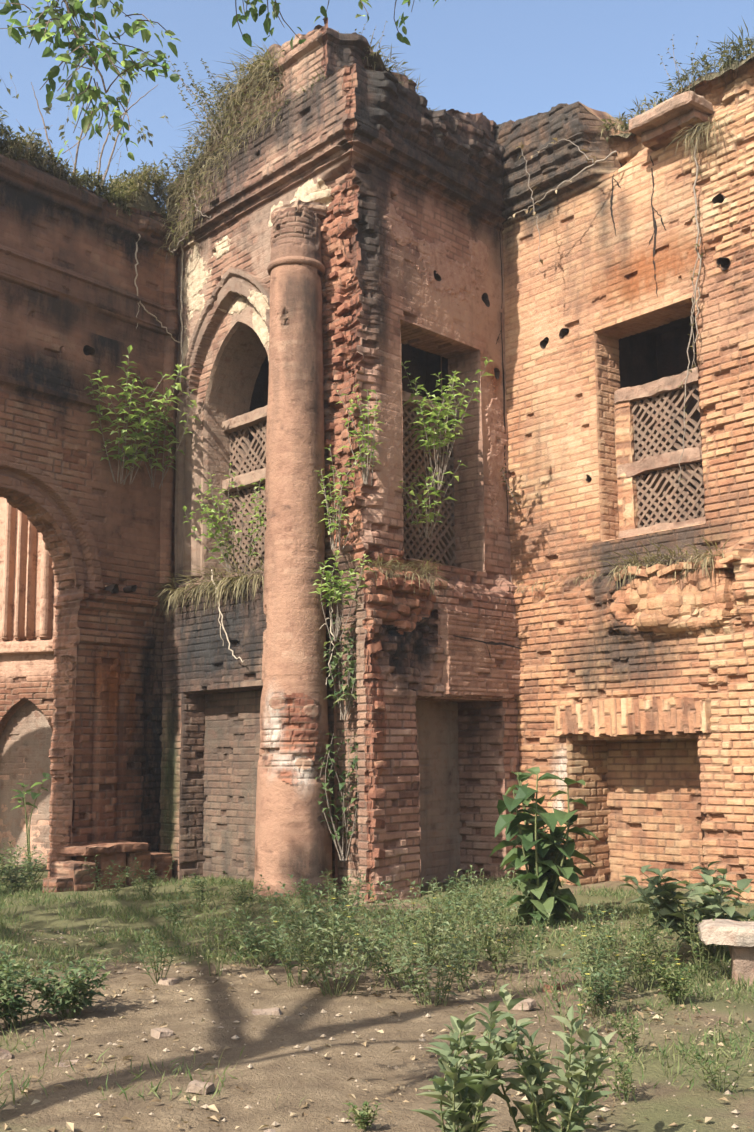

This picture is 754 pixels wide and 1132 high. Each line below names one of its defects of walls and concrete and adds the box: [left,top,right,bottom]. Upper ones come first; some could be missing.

spalling [268,17,448,903]
crack [453,635,522,661]